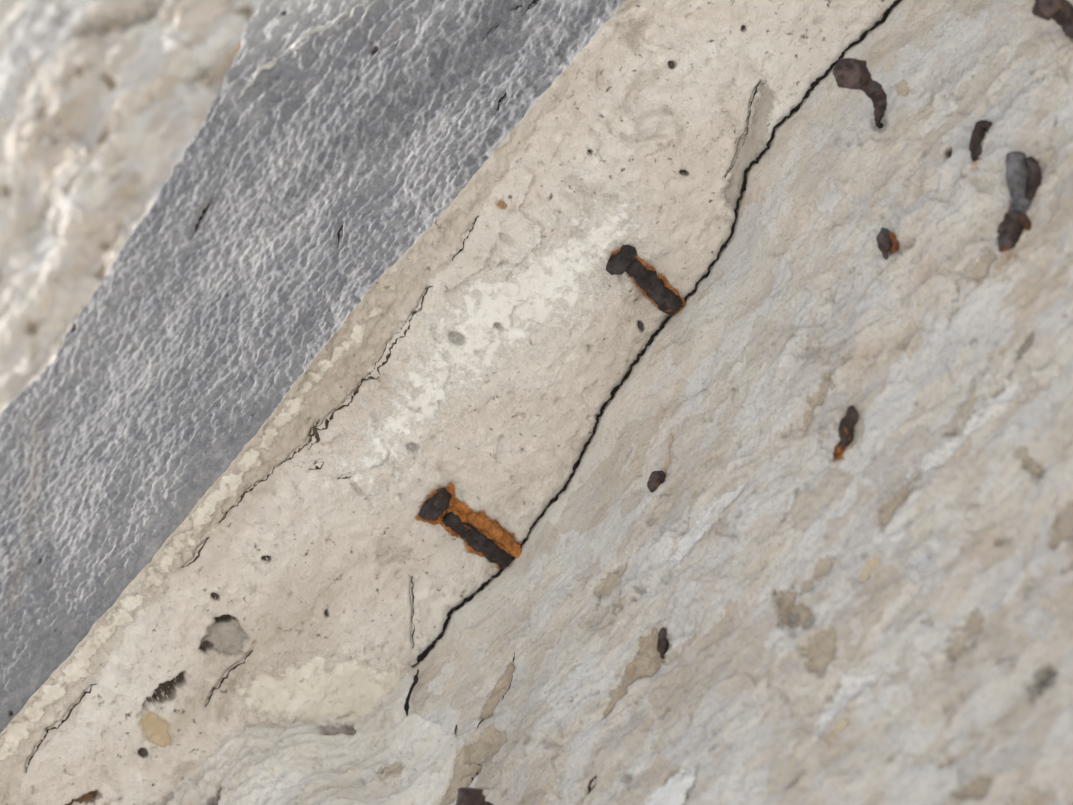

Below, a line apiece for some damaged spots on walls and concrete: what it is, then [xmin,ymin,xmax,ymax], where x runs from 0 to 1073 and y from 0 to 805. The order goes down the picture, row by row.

corrosion [1019,157,1042,231]
corrosion [888,232,899,253]
corrosion [634,255,686,316]
crack [404,0,901,716]
crack [181,286,433,568]
corrosion [832,443,847,461]
corrosion [416,483,522,569]
spalling [200,614,248,655]
spalling [146,671,184,702]
crack [205,650,253,706]
crack [26,684,96,772]